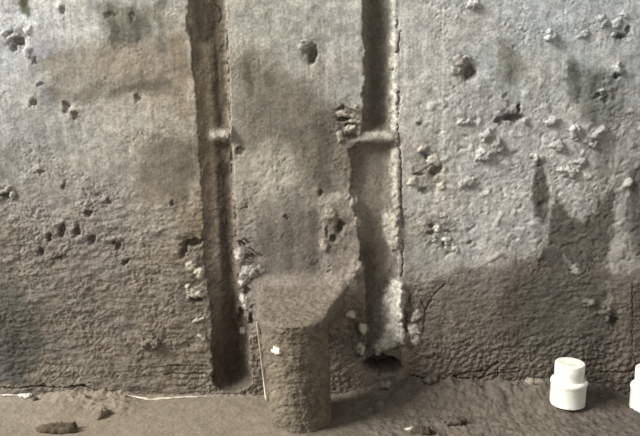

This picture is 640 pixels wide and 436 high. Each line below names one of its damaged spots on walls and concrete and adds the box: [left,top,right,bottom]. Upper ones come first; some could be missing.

flaking render [337,104,361,142]
flaking render [181,238,206,301]
flaking render [234,241,264,335]
water stain [410,160,640,380]
flaking render [400,296,423,345]